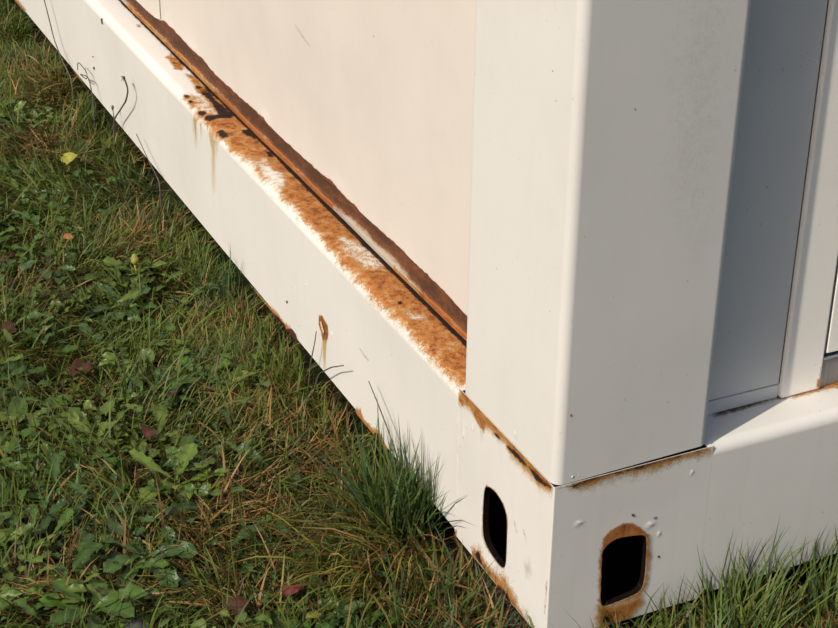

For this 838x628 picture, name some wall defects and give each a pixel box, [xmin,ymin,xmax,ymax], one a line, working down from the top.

rust [119,0,551,491]
rust [777,379,838,399]
rust [569,448,710,489]
rust [596,523,651,628]